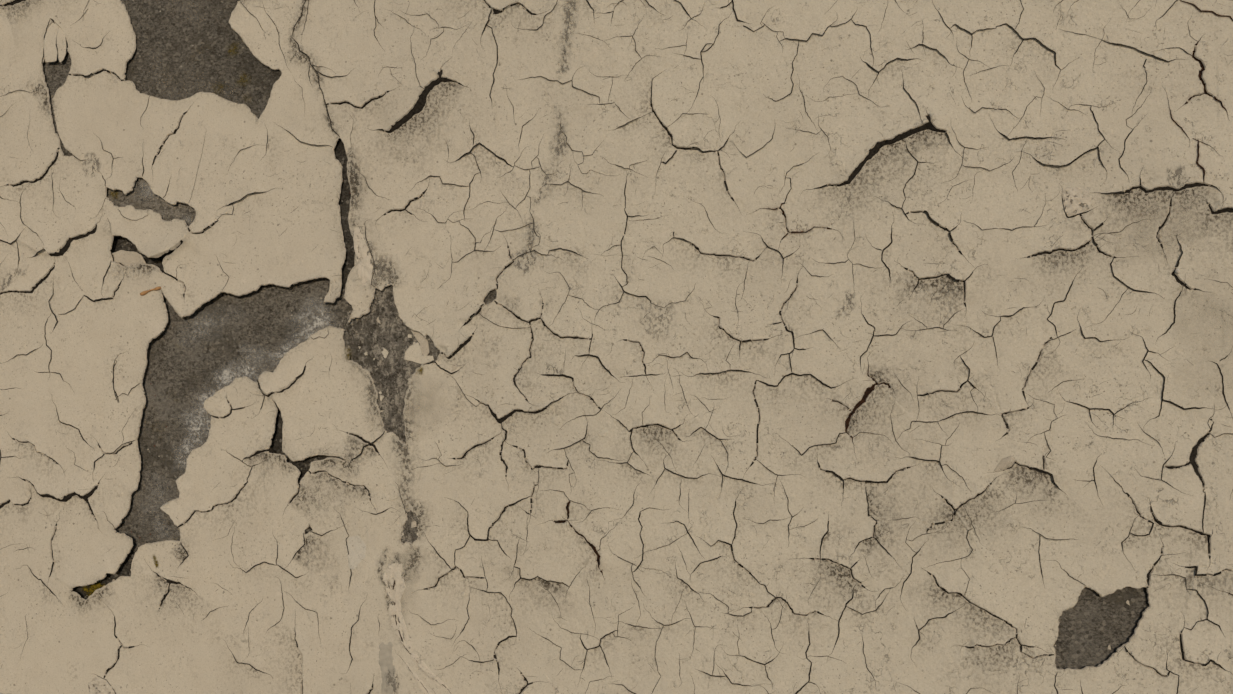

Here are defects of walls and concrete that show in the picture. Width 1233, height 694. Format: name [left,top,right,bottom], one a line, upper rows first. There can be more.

crack [42,1,124,81]
peeling [121,0,282,119]
crack [230,0,402,166]
peeling [110,236,183,273]
peeling [107,178,196,226]
crack [188,175,288,287]
crack [0,89,206,659]
crack [211,332,332,419]
peeling [72,278,458,600]
crack [143,448,275,620]
crack [219,404,422,675]
peeling [1054,587,1149,669]